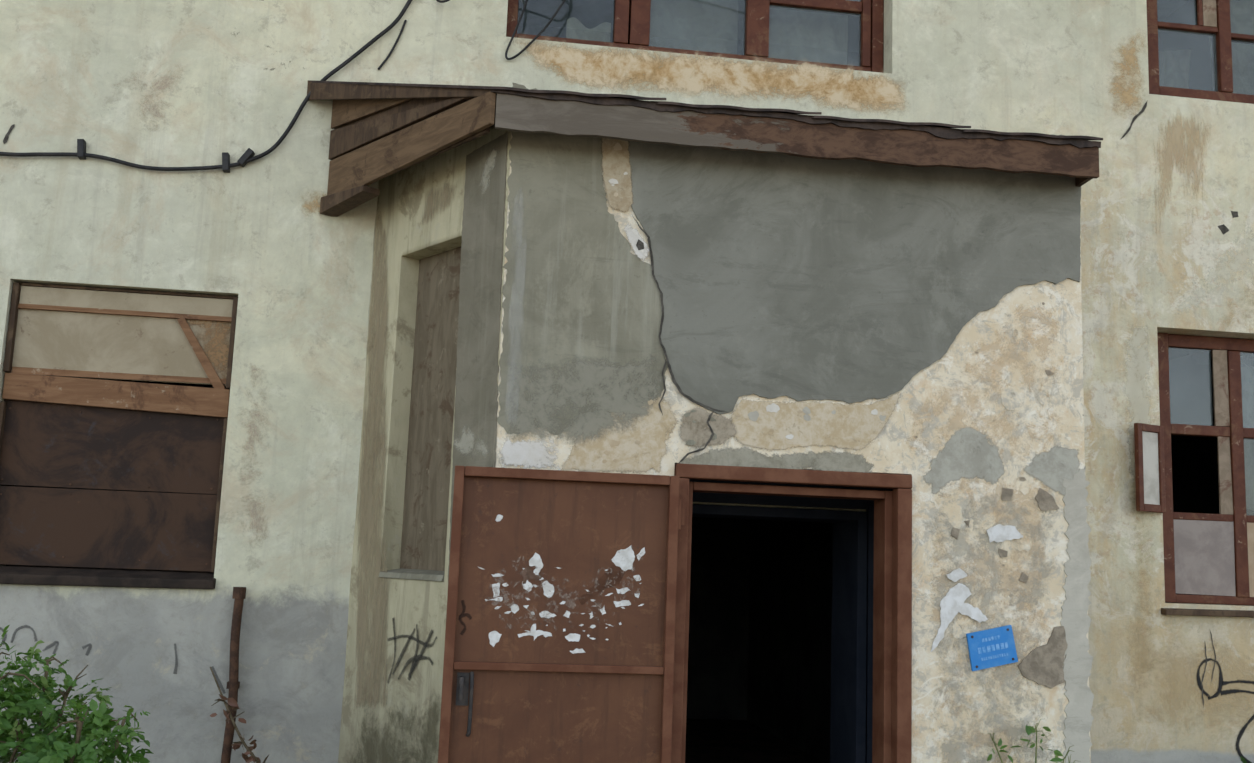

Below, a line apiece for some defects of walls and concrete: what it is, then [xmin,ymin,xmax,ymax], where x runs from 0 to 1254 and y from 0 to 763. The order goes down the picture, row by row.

crack [632,215,726,463]
flaking render [979,305,1015,326]
flaking render [562,393,900,473]
damp [356,217,411,729]
spalling [989,477,1059,511]
flaking render [998,539,1031,567]
flaking render [920,618,976,639]
spalling [1017,626,1068,689]